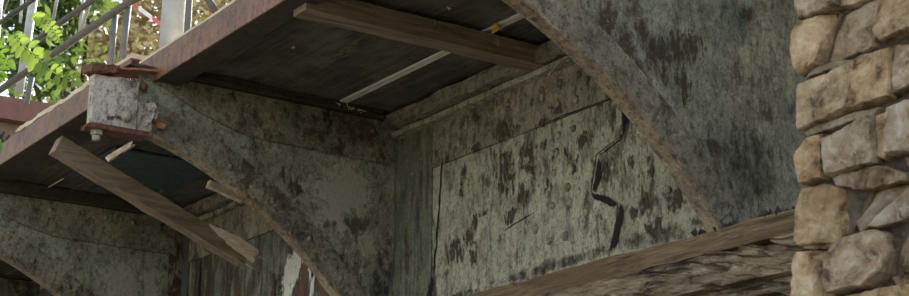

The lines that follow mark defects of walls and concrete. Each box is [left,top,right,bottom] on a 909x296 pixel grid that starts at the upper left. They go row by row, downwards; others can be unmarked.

crack [546,98,625,249]
crack [427,162,443,296]
damp [625,225,681,246]
peeling [281,251,315,296]
damp [509,247,604,281]